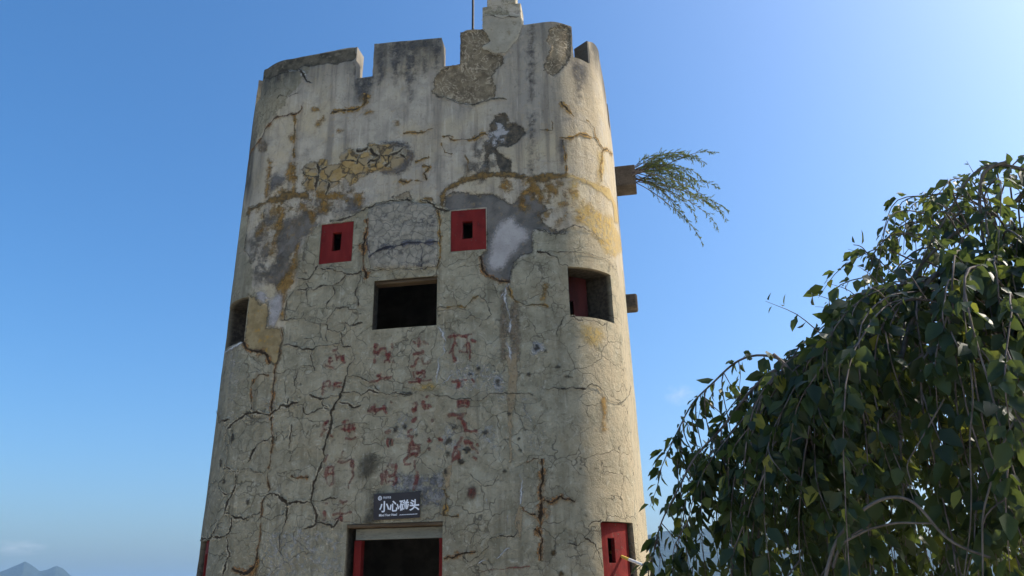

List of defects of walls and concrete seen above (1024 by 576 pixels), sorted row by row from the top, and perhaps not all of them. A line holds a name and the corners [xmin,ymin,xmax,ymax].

spalling [431,29,504,104]
spalling [543,24,571,76]
peeling [302,142,414,194]
peeling [483,112,526,172]
peeling [444,190,566,283]
leakage [245,215,288,365]
crack [200,69,631,576]